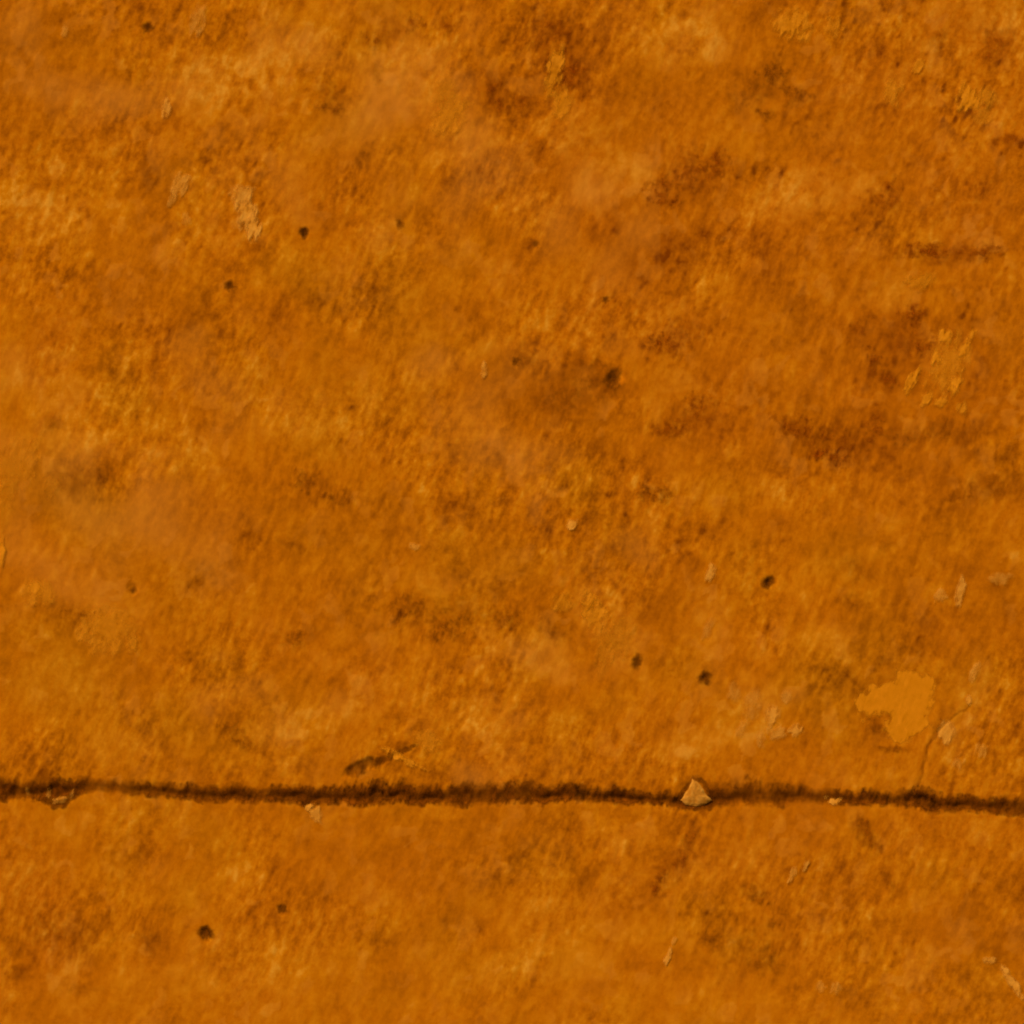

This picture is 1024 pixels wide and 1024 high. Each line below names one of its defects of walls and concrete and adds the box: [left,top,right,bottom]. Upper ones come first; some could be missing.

peeling [854,670,954,744]
crack [0,778,93,809]
crack [125,744,1024,816]
spalling [681,779,712,807]